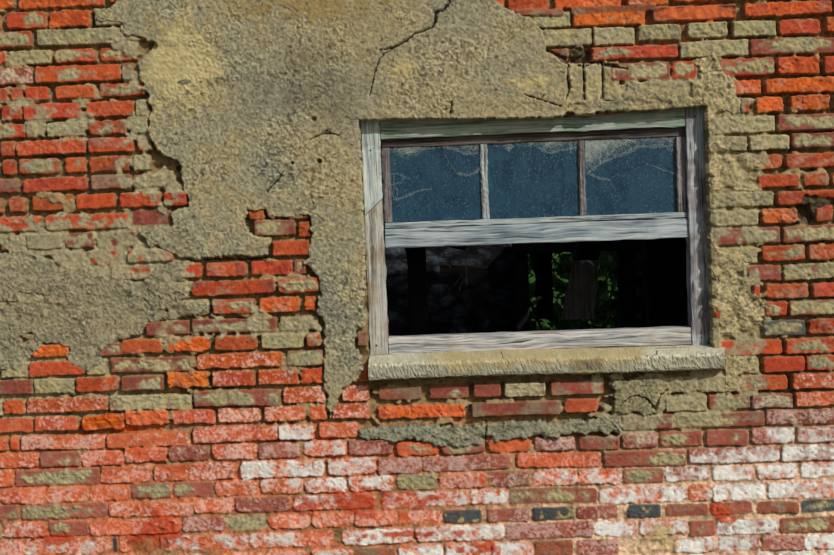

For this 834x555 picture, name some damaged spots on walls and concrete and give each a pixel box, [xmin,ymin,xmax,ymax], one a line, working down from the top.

crack [369,0,452,95]
crack [525,50,626,107]
flaking render [705,141,760,192]
flaking render [0,0,741,418]
spalling [796,195,834,224]
flaking render [707,234,765,333]
flaking render [358,376,661,448]
crack [620,390,667,409]
water stain [292,486,375,519]
water stain [127,505,187,552]
water stain [362,530,433,539]
water stain [457,540,500,555]